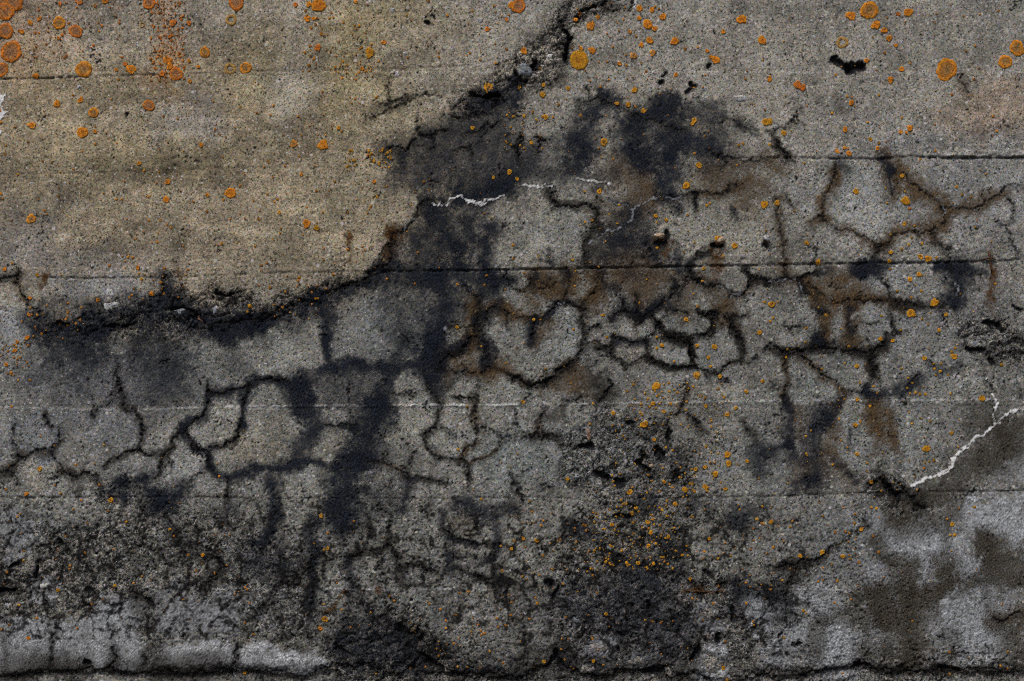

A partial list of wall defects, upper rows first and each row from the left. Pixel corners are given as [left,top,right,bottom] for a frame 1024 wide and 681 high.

crack [656,153,752,204]
water stain [879,154,901,202]
water stain [23,76,753,546]
water stain [800,258,893,346]
water stain [933,261,988,310]
crack [0,163,1020,681]
water stain [859,362,940,447]
water stain [440,498,514,570]
water stain [739,393,1024,681]
water stain [686,665,728,681]